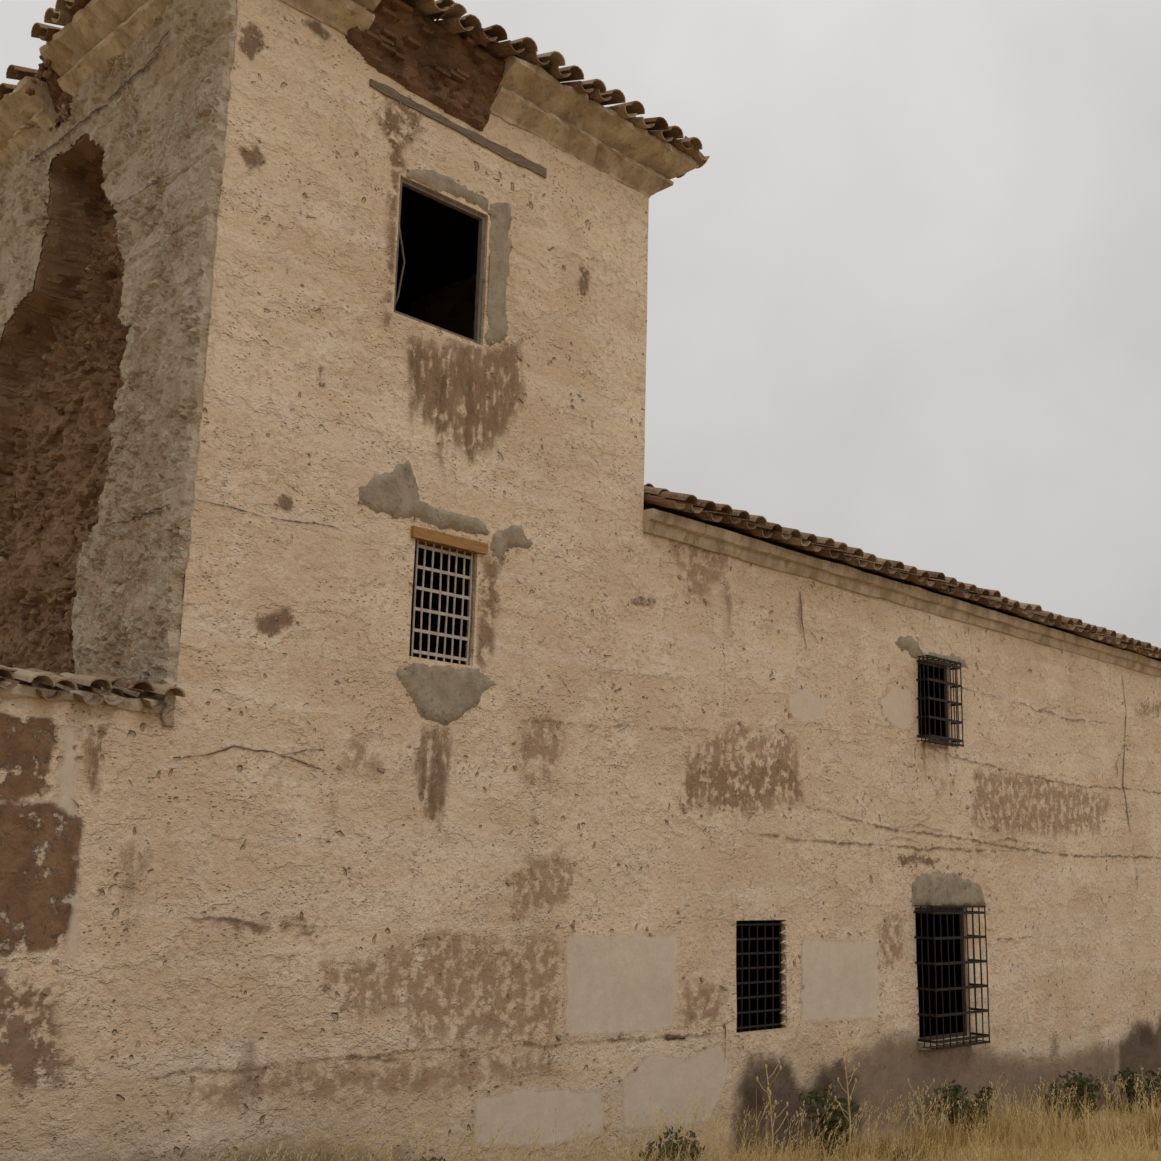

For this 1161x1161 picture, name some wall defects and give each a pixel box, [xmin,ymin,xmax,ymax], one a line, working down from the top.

flaking render [306,20,329,40]
spalling [345,0,505,300]
spalling [0,132,132,686]
crack [177,745,326,771]
peeling [681,685,827,817]
crack [768,676,1160,890]
peeling [966,768,1106,832]
flaking render [0,713,82,1085]
peeling [322,933,570,1064]